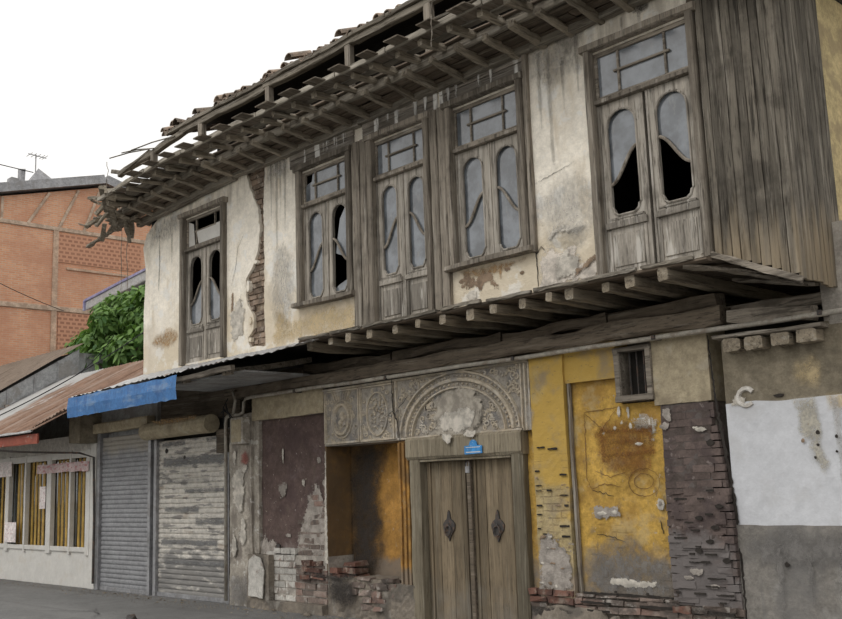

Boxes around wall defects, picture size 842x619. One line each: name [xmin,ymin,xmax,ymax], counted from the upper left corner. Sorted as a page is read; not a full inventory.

spalling [230,167,266,347]
peeling [459,269,499,300]
flaking render [430,384,485,444]
peeling [164,451,248,557]
flaking render [248,534,281,598]
peeling [286,452,400,612]
peeling [528,533,576,615]
peeling [610,578,657,588]